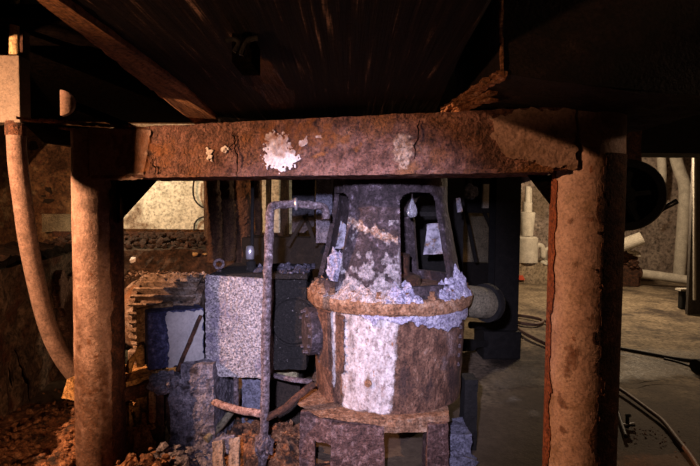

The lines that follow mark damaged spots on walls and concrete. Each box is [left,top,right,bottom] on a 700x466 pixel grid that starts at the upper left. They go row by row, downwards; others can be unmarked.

crack [228,132,238,179]
peeling [489,107,579,170]
corrosion [542,171,567,466]
corrosion [588,152,627,466]